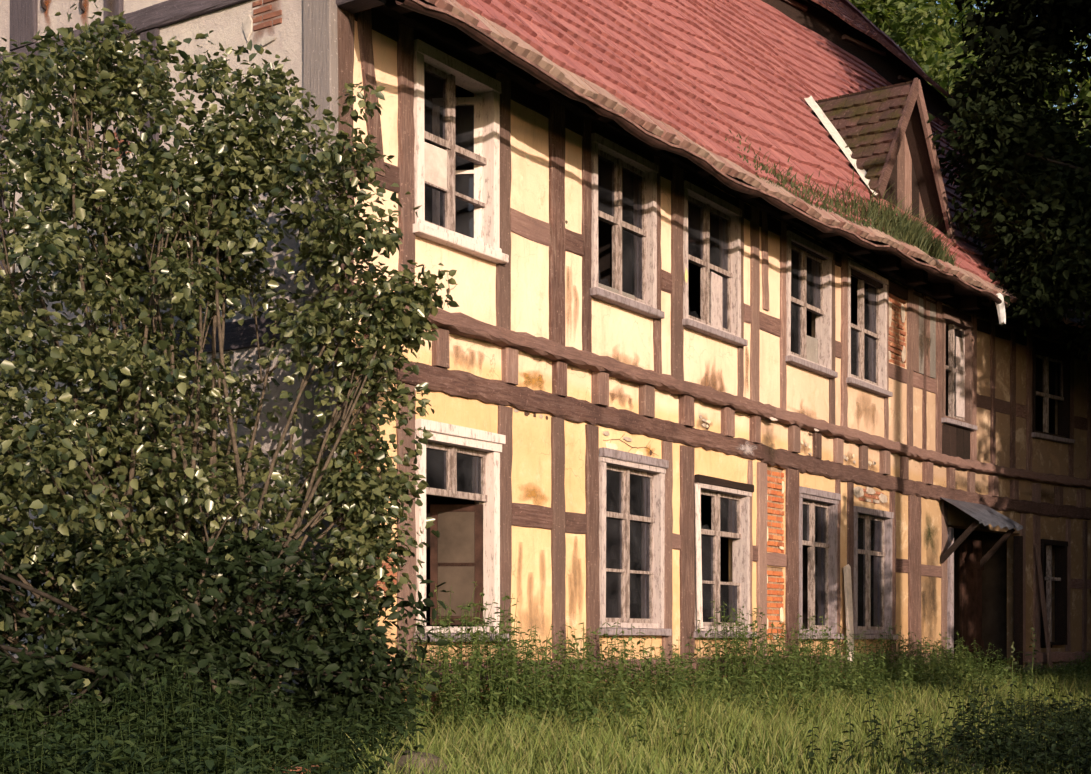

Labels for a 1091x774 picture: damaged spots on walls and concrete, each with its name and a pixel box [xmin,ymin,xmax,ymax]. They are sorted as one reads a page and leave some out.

spalling [243,0,282,47]
spalling [888,293,906,368]
water stain [704,373,723,392]
spalling [767,466,785,554]
spalling [767,566,784,640]